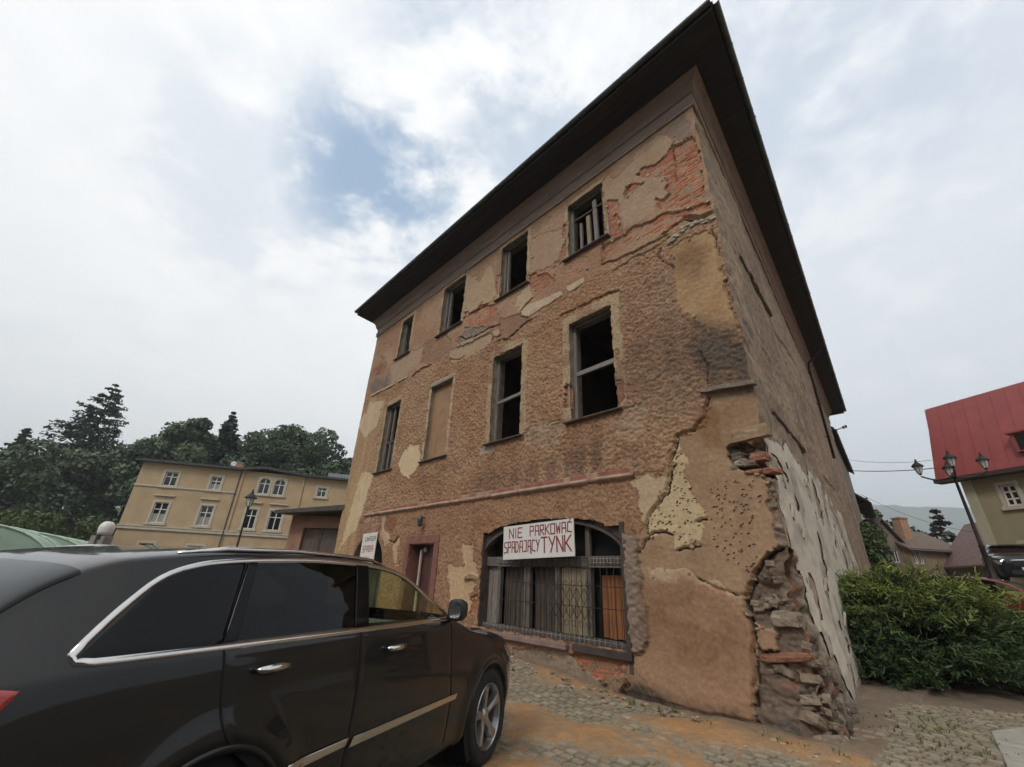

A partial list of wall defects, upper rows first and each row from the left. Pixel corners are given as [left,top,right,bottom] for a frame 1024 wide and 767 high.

flaking render [601,134,710,259]
flaking render [450,224,591,363]
flaking render [338,471,373,550]
flaking render [359,400,384,437]
flaking render [398,443,421,478]
flaking render [447,543,478,613]
crack [639,353,711,553]
flaking render [512,379,861,699]